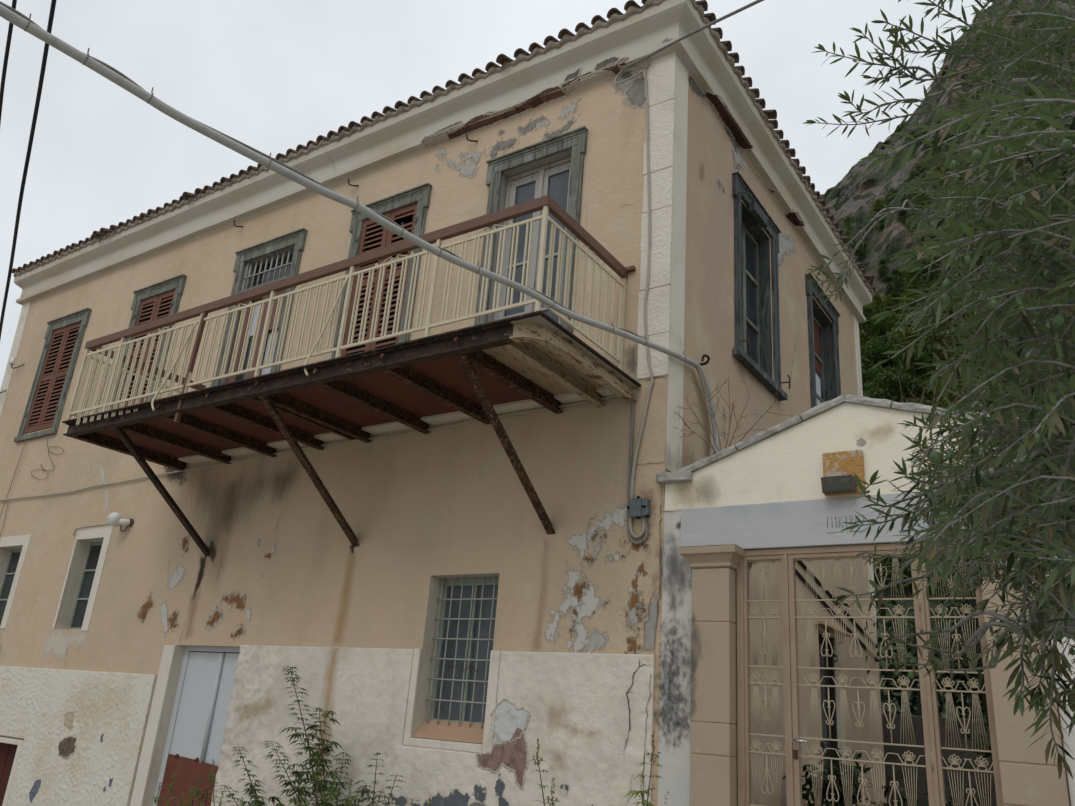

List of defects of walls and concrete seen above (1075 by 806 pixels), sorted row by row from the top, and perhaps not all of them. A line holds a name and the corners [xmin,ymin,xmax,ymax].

spalling [421,56,649,178]
peeling [205,592,251,640]
peeling [544,494,653,654]
crack [624,491,681,806]
water stain [659,631,696,739]
spalling [57,735,78,759]
flaking render [391,698,532,806]